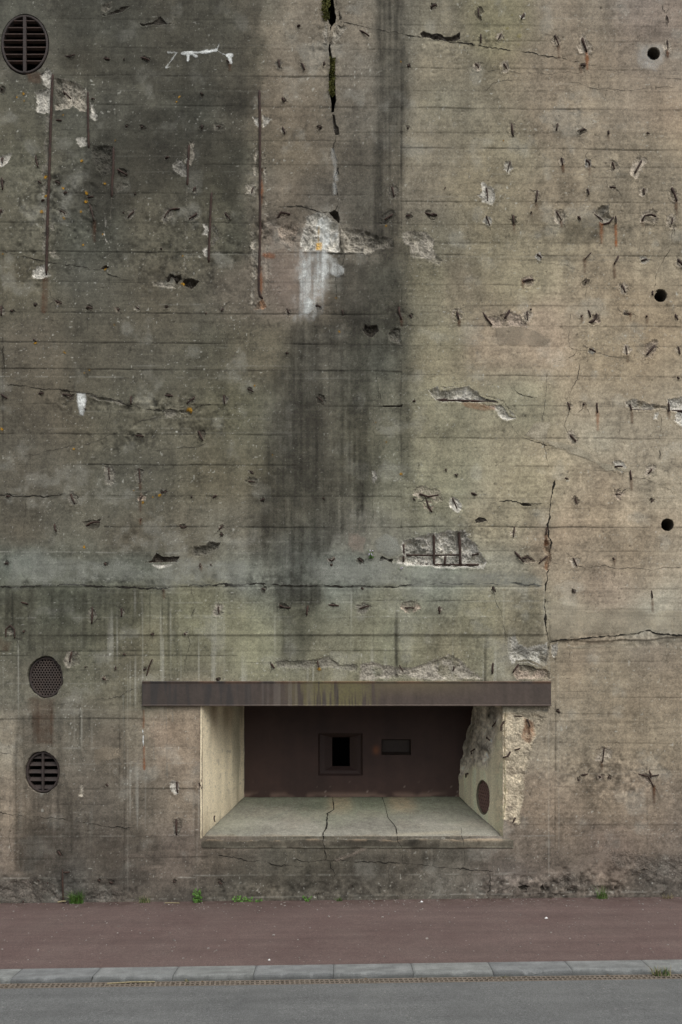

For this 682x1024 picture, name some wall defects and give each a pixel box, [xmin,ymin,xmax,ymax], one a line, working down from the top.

crack [324,0,678,114]
spalling [29,66,139,281]
spalling [243,90,447,312]
water stain [297,218,337,312]
spalling [426,384,518,423]
crack [0,253,682,670]
spalling [355,515,489,571]
spalling [267,651,486,681]
spalling [502,706,562,826]
crack [218,797,509,898]